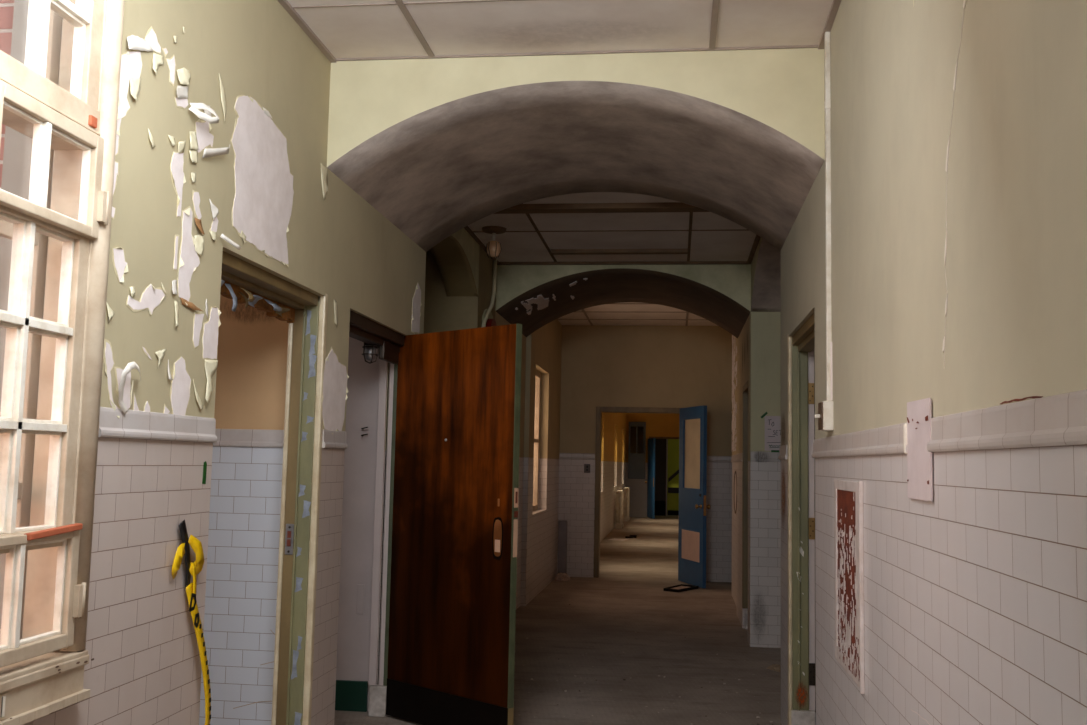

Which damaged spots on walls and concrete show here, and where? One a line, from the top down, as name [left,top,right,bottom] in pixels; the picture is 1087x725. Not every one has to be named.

peeling [103,26,349,442]
peeling [515,294,556,315]
crack [942,0,967,368]